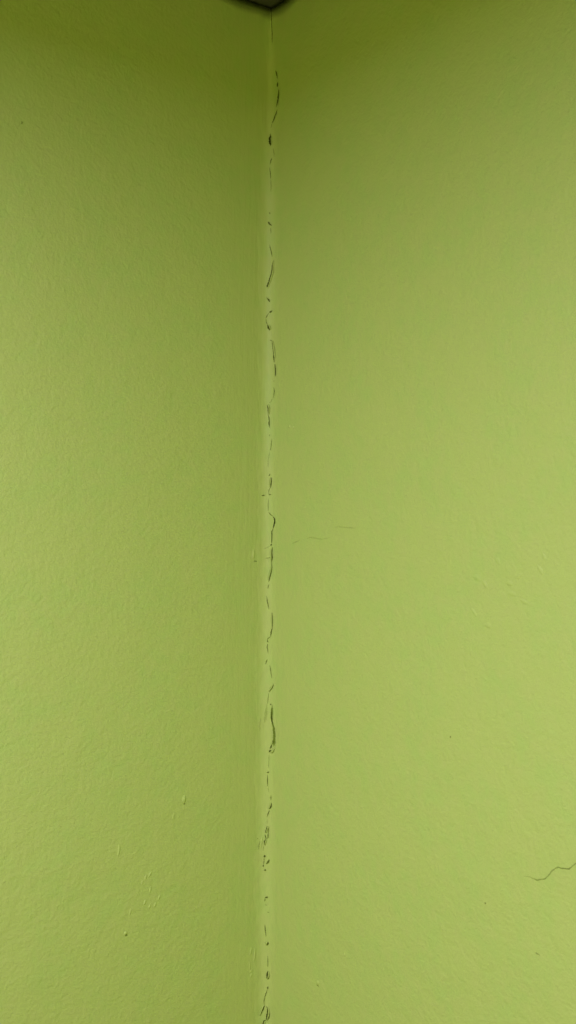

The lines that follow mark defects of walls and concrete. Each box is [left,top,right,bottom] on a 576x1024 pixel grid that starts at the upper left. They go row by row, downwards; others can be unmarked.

crack [262,222,276,703]
crack [263,772,272,871]
crack [259,928,270,1024]